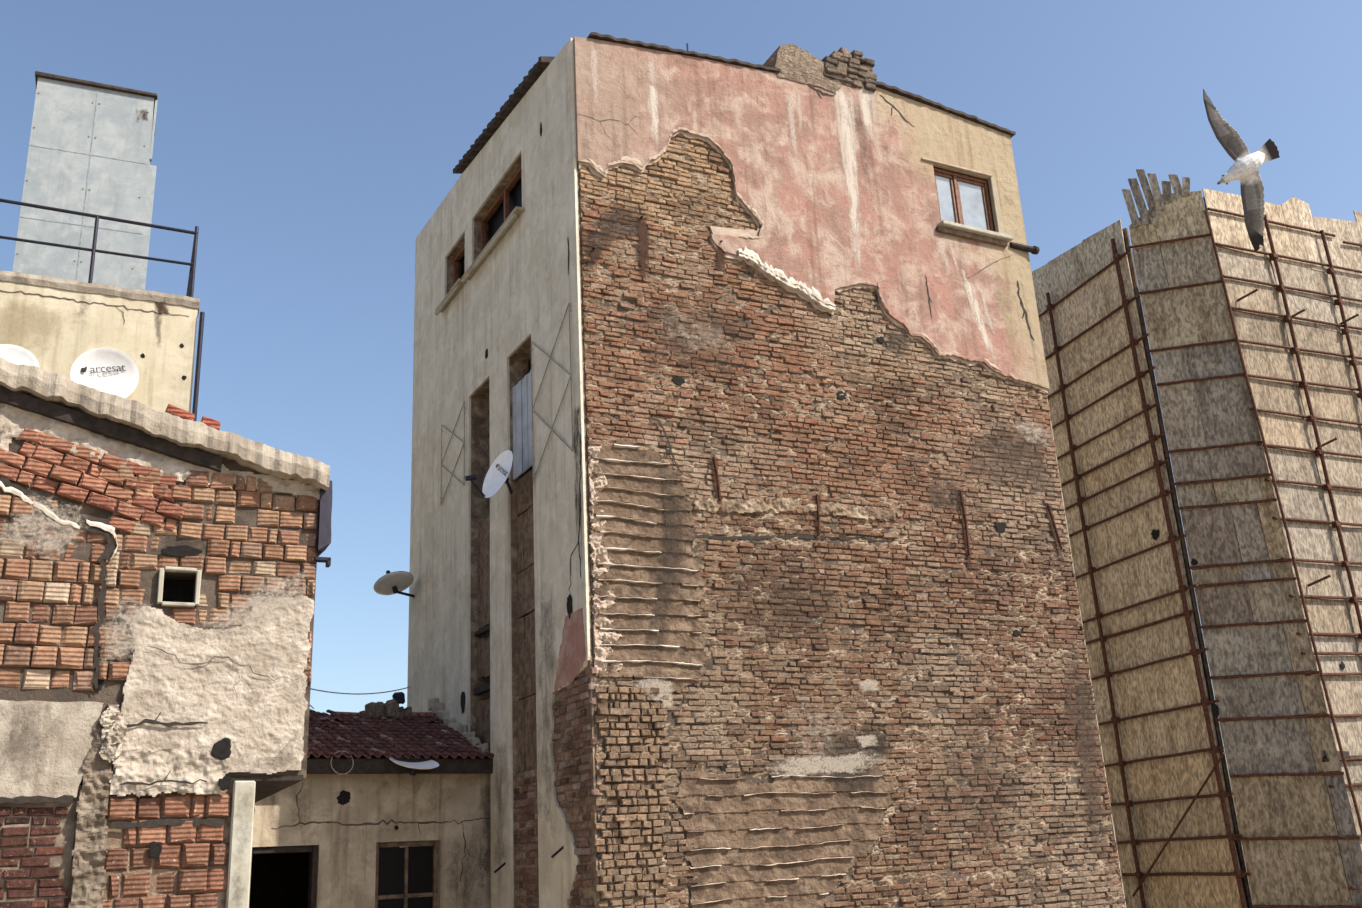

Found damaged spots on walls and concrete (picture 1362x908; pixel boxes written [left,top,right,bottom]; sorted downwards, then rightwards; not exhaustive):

flaking render [579,127,836,311]
water stain [835,87,875,264]
crack [964,256,1034,340]
spalling [554,438,623,691]
corrosion [711,455,722,515]
corrosion [957,490,972,567]
crack [147,646,300,700]
crack [271,782,490,882]